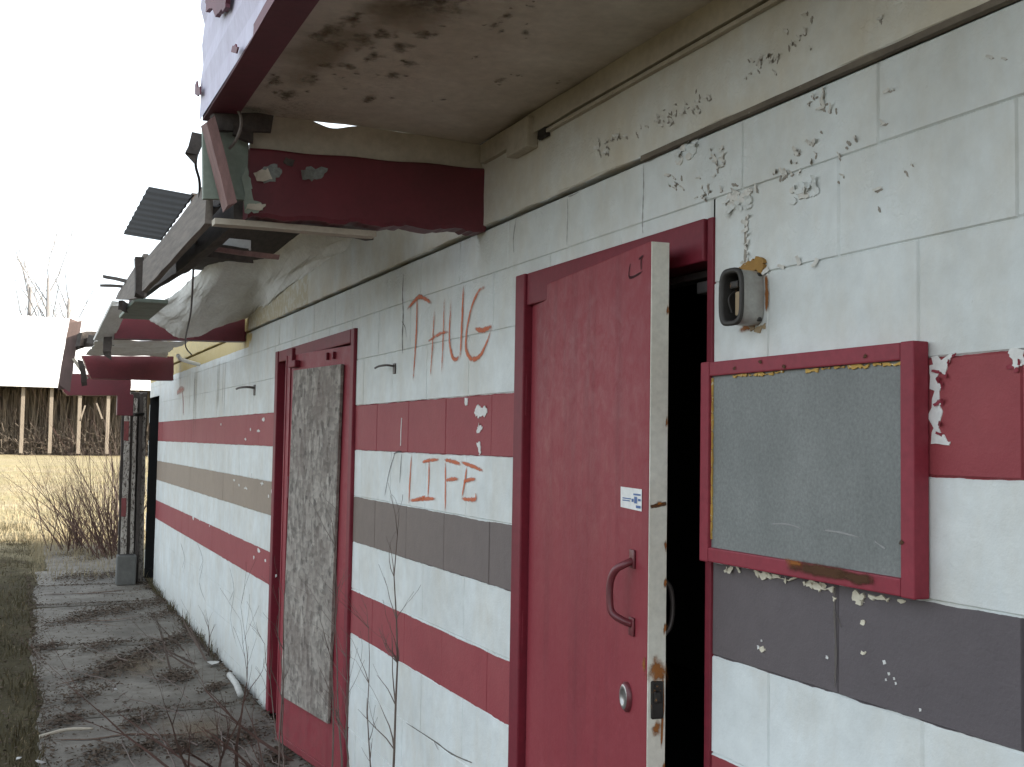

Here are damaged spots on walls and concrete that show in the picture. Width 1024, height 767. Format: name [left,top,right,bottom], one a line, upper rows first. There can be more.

peeling [807,87,837,115]
peeling [241,157,328,214]
peeling [664,139,759,265]
peeling [773,131,823,205]
corrosion [739,256,769,333]
peeling [1006,348,1024,373]
peeling [464,398,488,455]
peeling [929,353,956,445]
peeling [754,570,837,601]
corrosion [788,560,873,585]
peeling [852,590,906,606]
corrosion [642,658,666,745]